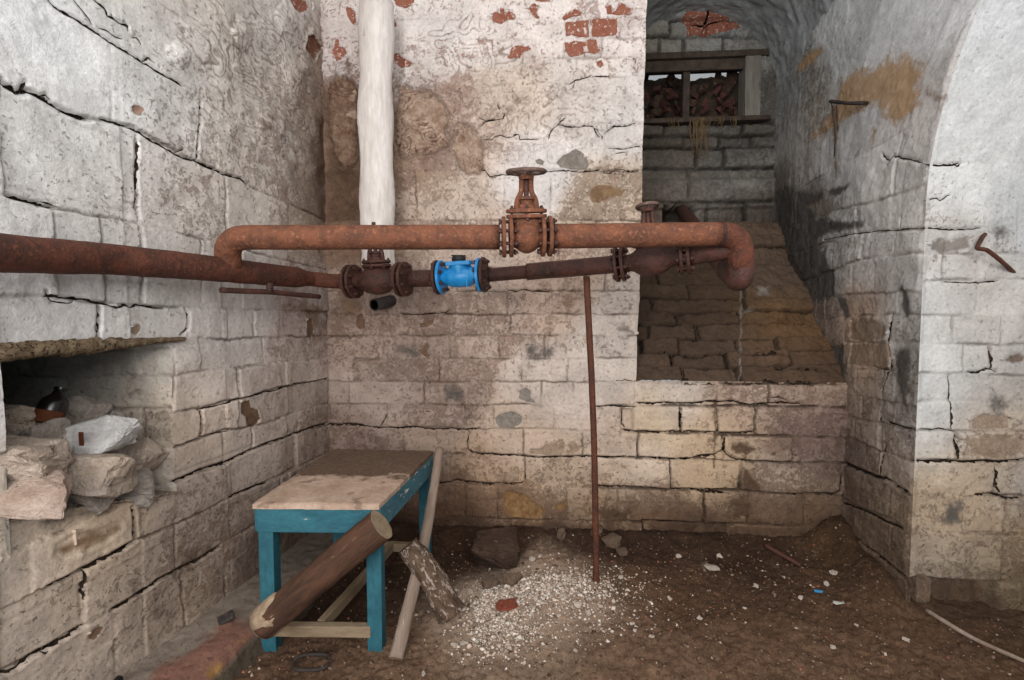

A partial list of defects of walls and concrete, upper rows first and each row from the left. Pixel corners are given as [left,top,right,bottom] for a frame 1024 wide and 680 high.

crack [49,0,181,86]
spalling [487,8,516,24]
spalling [502,45,531,58]
spalling [526,0,553,19]
spalling [558,3,631,67]
crack [0,83,244,208]
crack [480,105,640,175]
rust [813,56,922,176]
water stain [824,221,863,232]
water stain [839,298,850,320]
crack [790,319,1022,529]
crack [0,508,134,673]